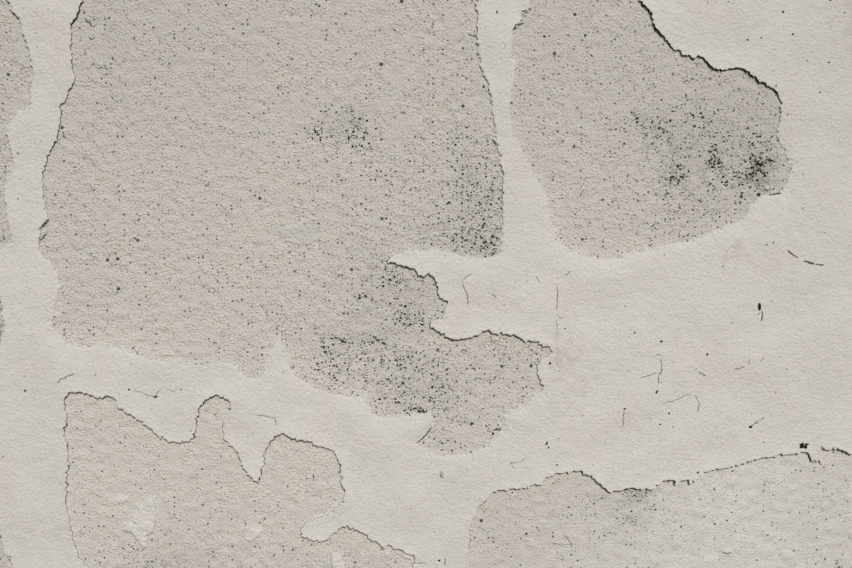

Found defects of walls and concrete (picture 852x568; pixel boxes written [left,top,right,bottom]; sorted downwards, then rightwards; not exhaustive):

peeling [0,0,34,250]
peeling [39,0,552,456]
peeling [509,0,791,260]
peeling [0,535,13,568]
peeling [63,392,415,568]
peeling [467,448,852,568]